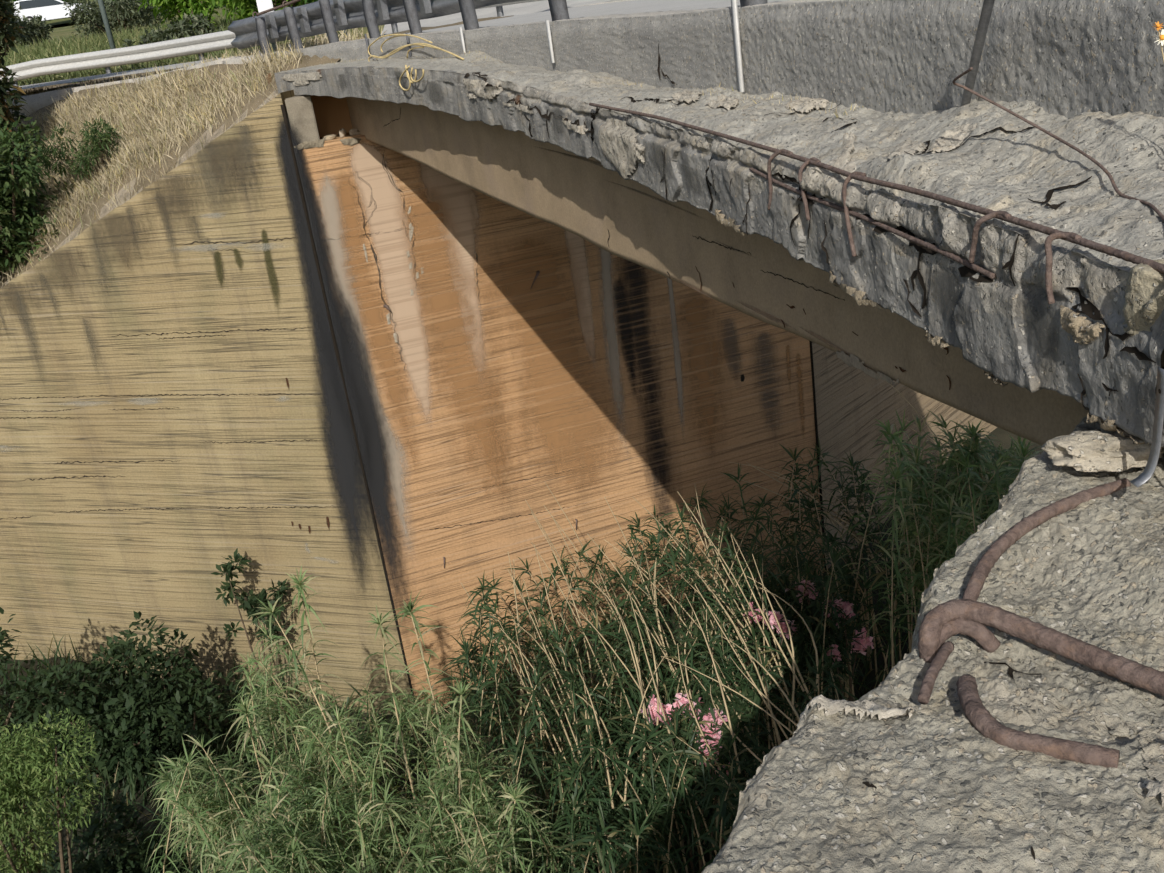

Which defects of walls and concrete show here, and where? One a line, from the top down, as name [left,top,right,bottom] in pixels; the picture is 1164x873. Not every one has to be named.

crack [174,109,417,371]
leakage [277,121,407,593]
leakage [351,144,430,415]
leakage [565,230,669,514]
spalling [785,97,829,114]
spalling [562,103,1164,345]
spalling [925,330,949,349]
crack [904,127,1035,155]
crack [1028,176,1092,209]
crack [410,503,582,533]
spalling [800,478,1164,720]
spalling [956,674,1164,806]